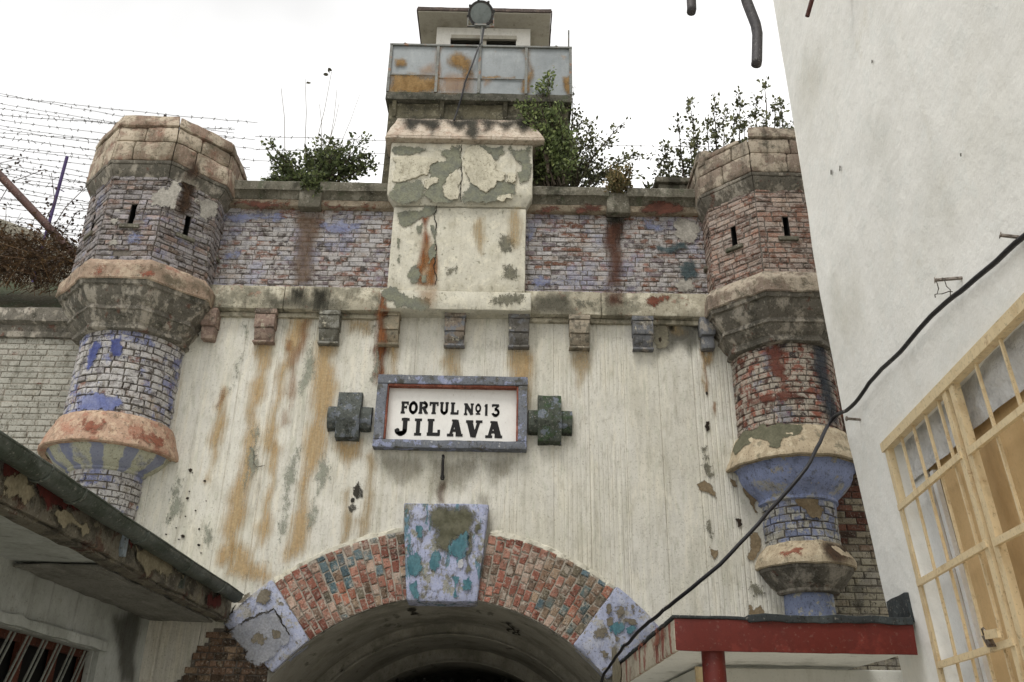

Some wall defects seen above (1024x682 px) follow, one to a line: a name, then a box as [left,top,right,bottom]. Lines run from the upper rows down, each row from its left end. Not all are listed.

corrosion [389,59,439,92]
corrosion [449,53,500,78]
peeling [151,179,182,209]
damp [275,215,332,309]
corrosion [417,218,437,285]
crack [433,145,463,285]
flaking render [375,144,534,310]
damp [537,217,636,312]
corrosion [373,294,396,378]
flaking render [732,422,803,454]
peeling [407,504,481,615]
crack [223,606,290,635]